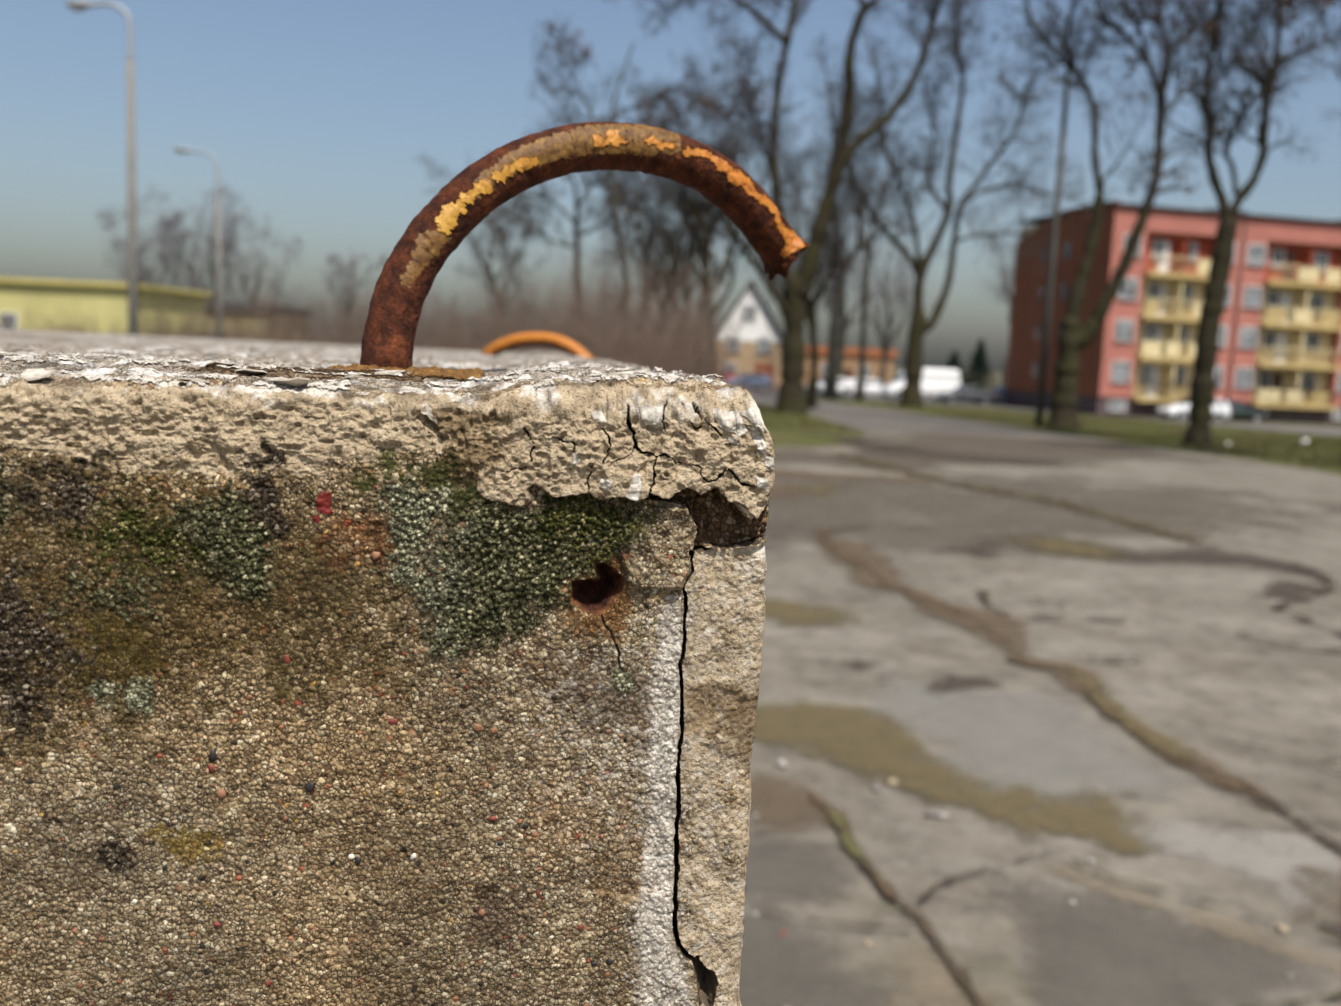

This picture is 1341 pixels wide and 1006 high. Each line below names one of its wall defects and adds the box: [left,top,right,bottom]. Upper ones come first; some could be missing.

spalling [649,408,774,548]
crack [839,454,1341,633]
crack [501,401,766,1006]
crack [813,525,1341,851]
crack [809,792,1066,1006]